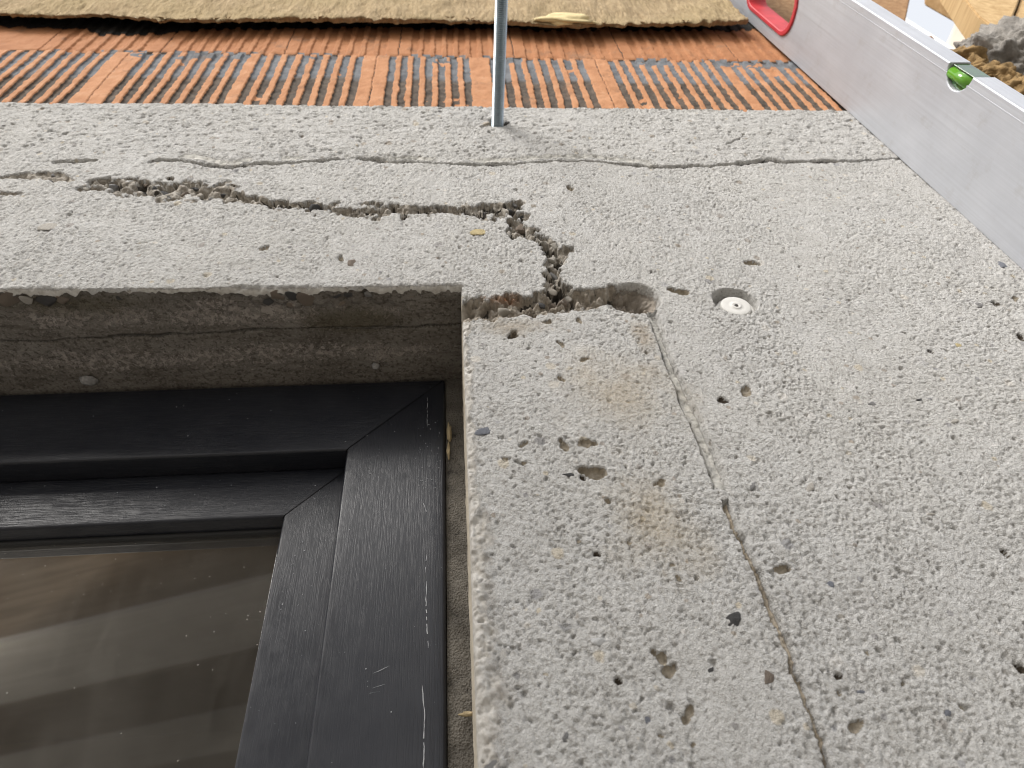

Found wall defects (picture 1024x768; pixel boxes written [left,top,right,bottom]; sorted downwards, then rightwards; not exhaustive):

crack [179,154,253,169]
crack [281,154,437,164]
crack [461,154,684,169]
spalling [0,172,657,768]
crack [648,317,826,768]